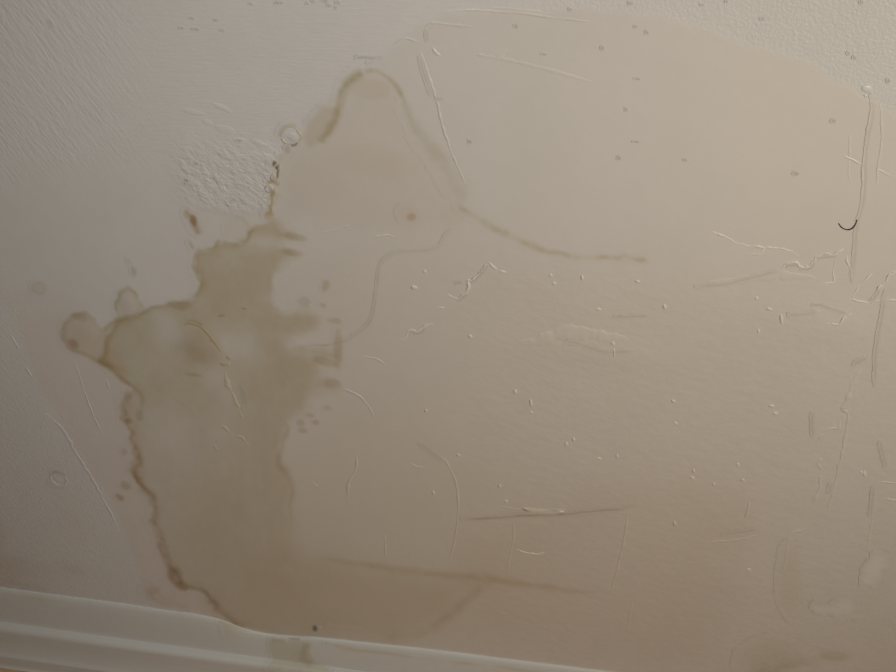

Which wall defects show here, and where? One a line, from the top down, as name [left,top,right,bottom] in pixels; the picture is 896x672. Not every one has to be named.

damp [282,62,653,268]
crack [713,231,896,326]
damp [56,211,608,672]